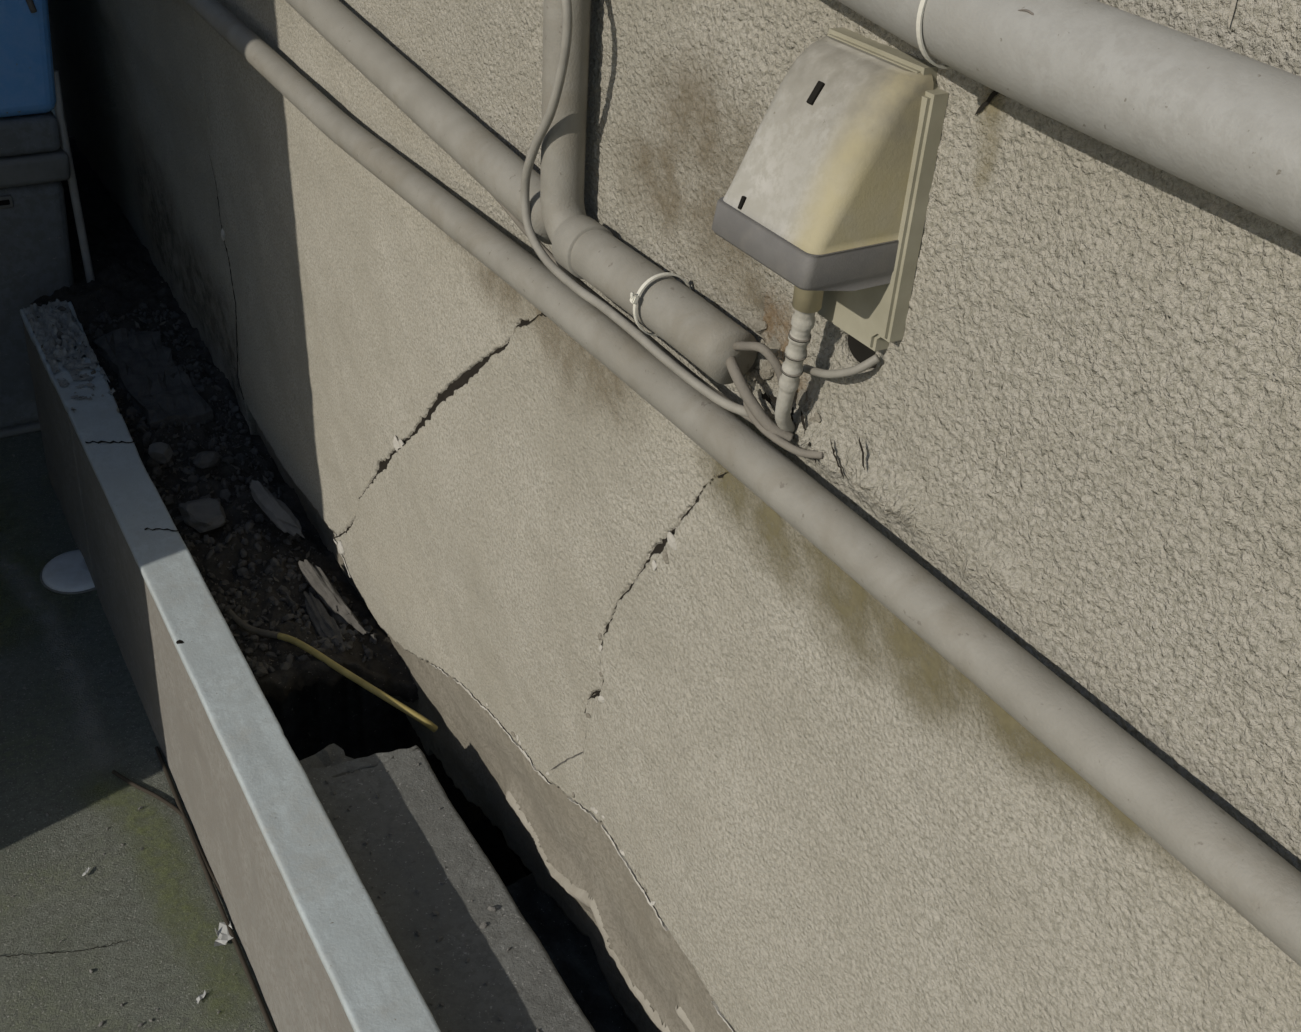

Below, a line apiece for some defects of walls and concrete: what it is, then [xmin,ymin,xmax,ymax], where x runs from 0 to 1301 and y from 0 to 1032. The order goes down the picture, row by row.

crack [975,91,998,115]
crack [332,313,546,555]
crack [551,472,728,770]